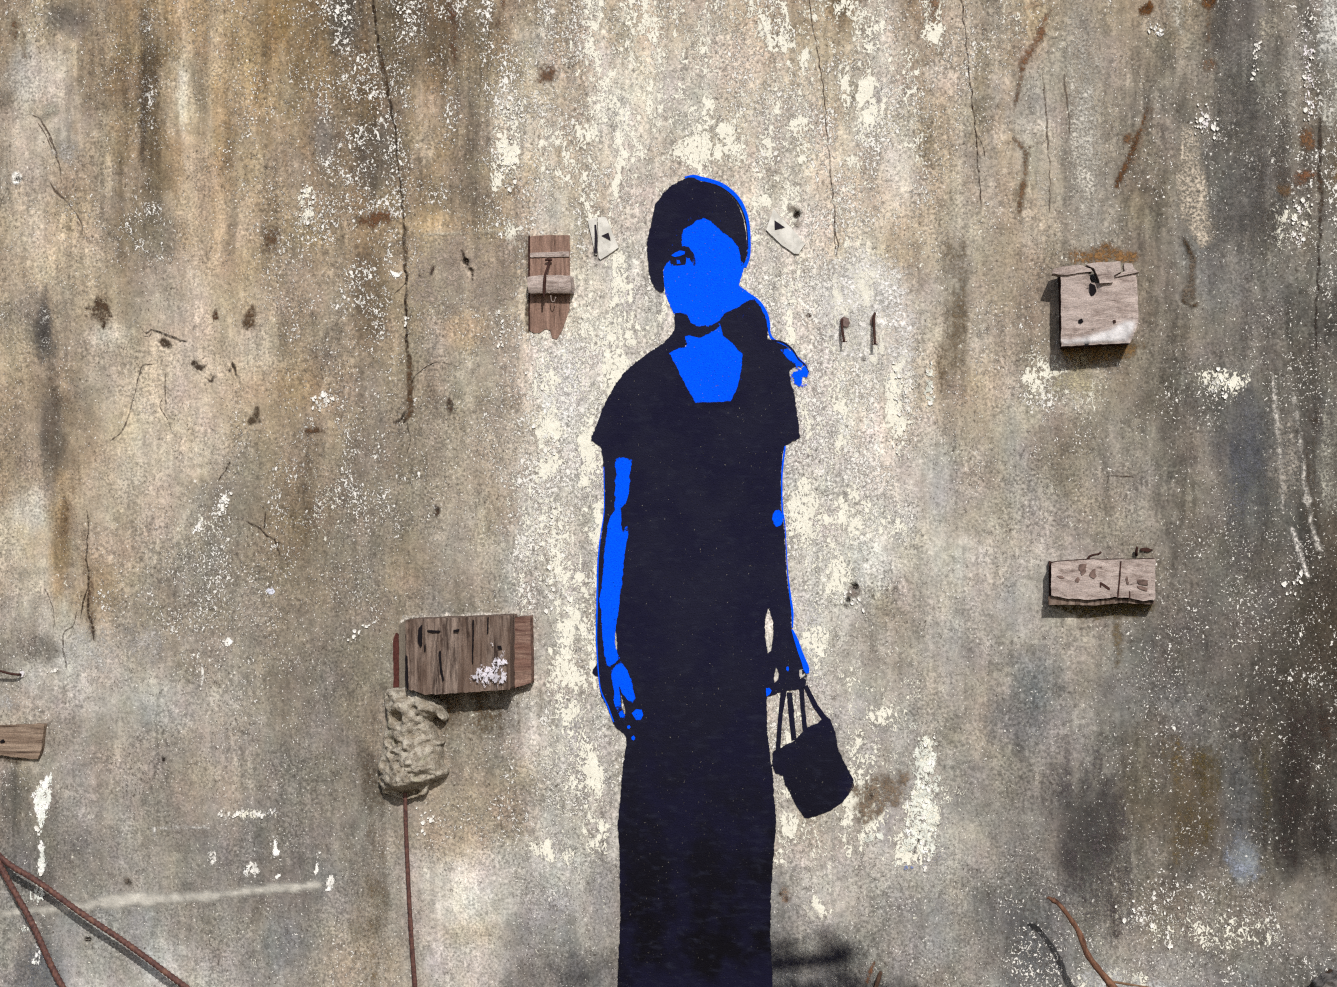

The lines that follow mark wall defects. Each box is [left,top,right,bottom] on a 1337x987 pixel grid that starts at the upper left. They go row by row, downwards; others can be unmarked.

crack [372,0,445,452]
crack [809,0,839,255]
crack [961,0,985,200]
corrosion [1015,140,1031,212]
corrosion [1014,2,1049,105]
corrosion [1070,243,1138,264]
corrosion [1115,108,1152,188]
crack [45,515,94,668]